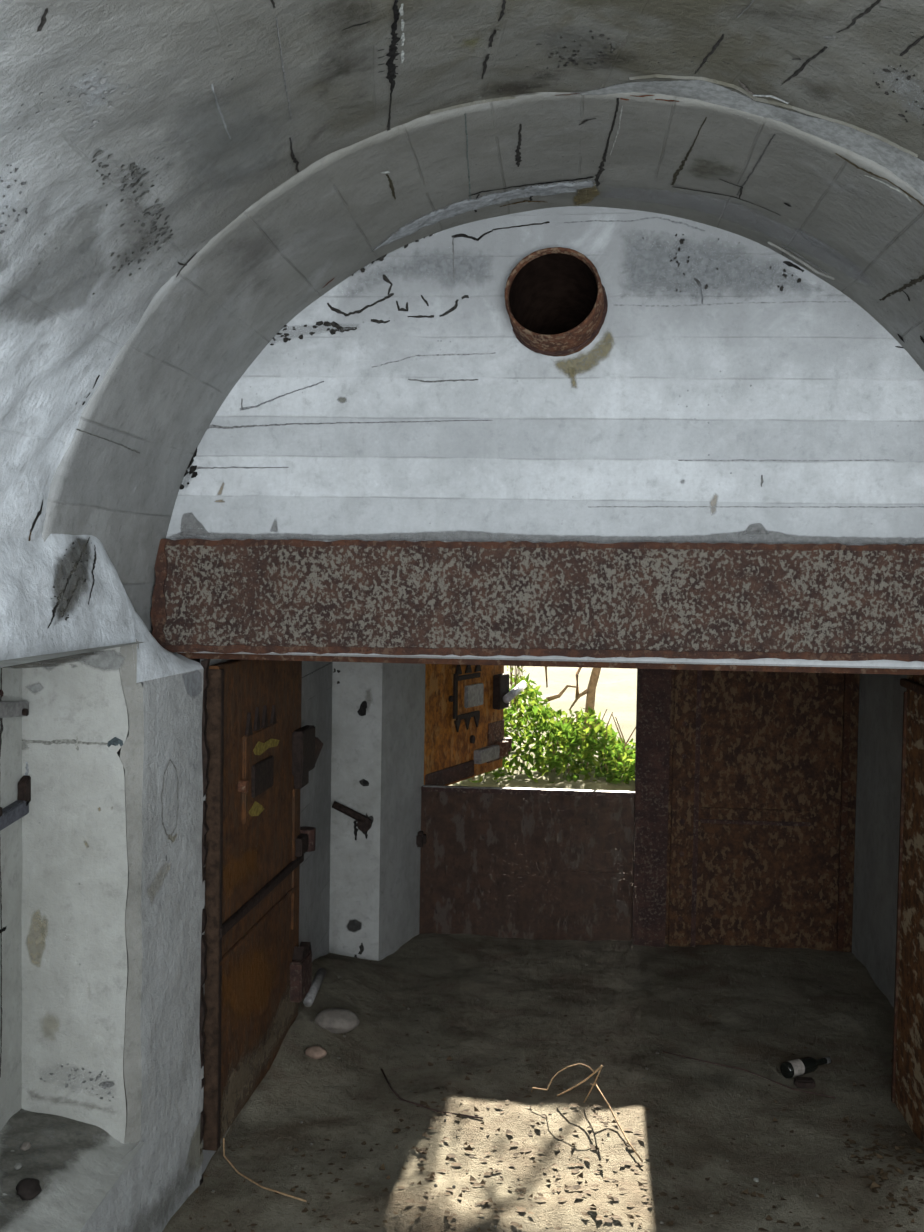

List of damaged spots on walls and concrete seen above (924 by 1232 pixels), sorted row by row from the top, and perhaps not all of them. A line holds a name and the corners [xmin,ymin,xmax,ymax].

crack [341,0,405,131]
crack [482,0,506,79]
crack [694,0,754,74]
crack [899,36,924,56]
crack [671,117,779,215]
spalling [352,181,595,276]
crack [323,93,705,333]
crack [372,352,496,383]
corrosion [556,333,613,388]
spalling [51,537,91,621]